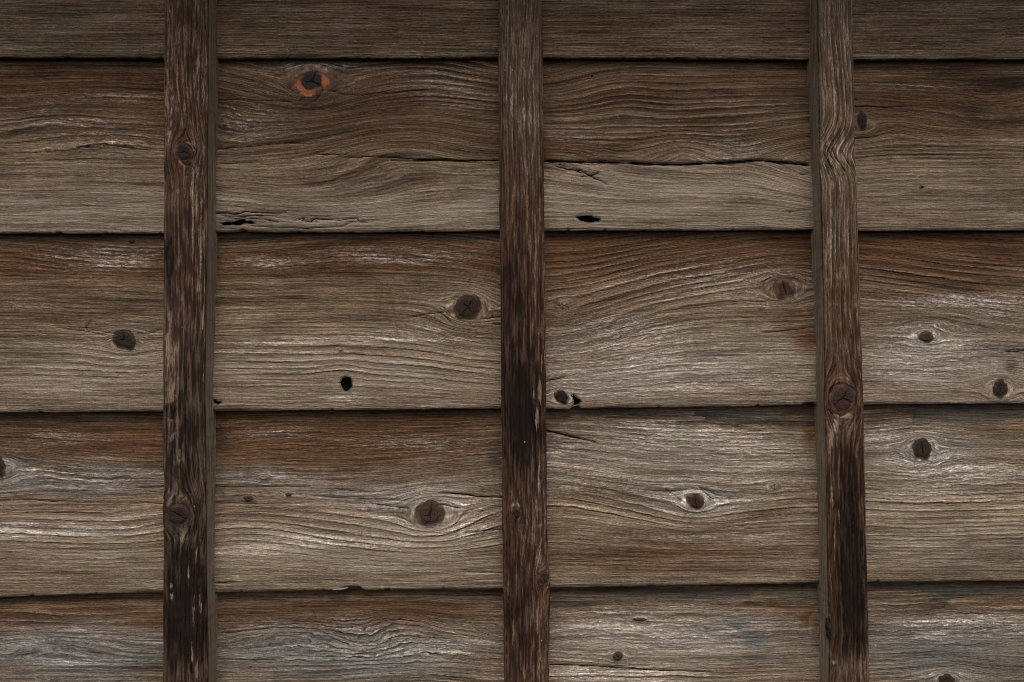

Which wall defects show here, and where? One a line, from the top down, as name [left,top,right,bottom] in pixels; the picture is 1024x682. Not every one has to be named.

crack [544,137,869,183]
crack [216,211,365,229]